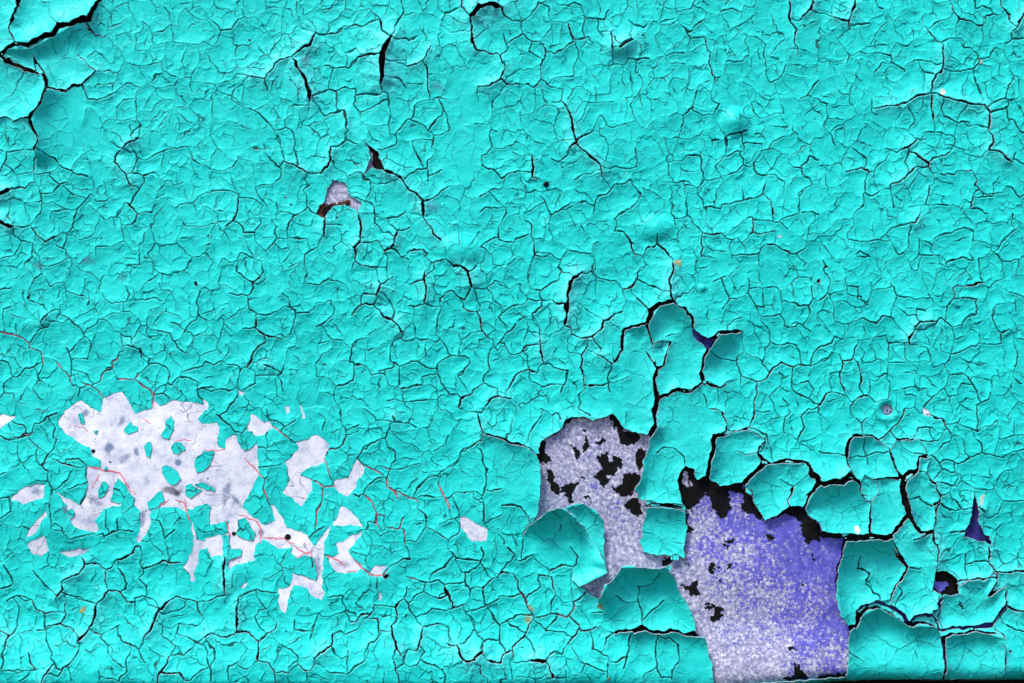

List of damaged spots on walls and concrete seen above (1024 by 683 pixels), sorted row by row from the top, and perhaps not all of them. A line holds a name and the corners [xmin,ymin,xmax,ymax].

crack [0,0,107,195]
crack [461,0,602,173]
peeling [316,180,361,220]
crack [352,170,487,337]
crack [554,233,801,477]
peeling [11,483,45,504]
peeling [26,511,90,557]
peeling [57,392,389,613]
crack [29,436,674,682]
peeling [460,517,488,542]
peeling [523,303,1011,683]
crack [740,409,1024,674]